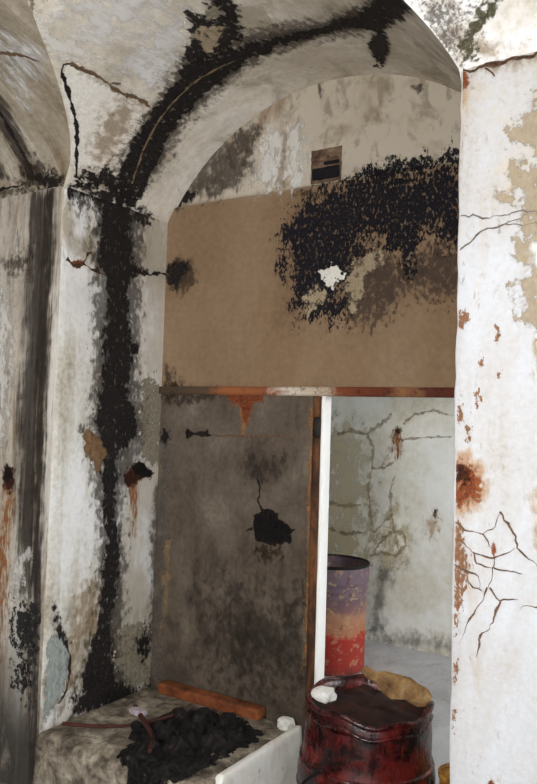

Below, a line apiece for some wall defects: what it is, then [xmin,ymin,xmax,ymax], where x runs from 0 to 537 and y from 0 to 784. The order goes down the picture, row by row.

damp [422,0,503,65]
crack [60,61,152,175]
crack [460,210,537,250]
peeling [495,89,537,339]
corrosion [0,463,16,636]
damp [6,548,42,707]
damp [51,599,73,704]
spalling [82,430,108,475]
corrosion [123,459,155,535]
damp [327,422,367,559]
corrosion [456,458,484,509]
crack [455,511,537,657]